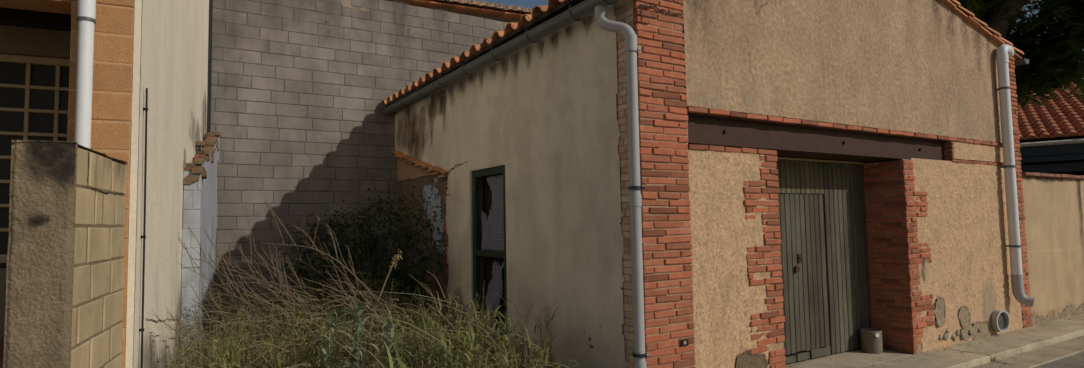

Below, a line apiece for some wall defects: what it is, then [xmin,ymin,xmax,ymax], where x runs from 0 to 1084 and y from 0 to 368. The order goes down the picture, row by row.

spalling [183,131,221,185]
spalling [398,174,449,336]
spalling [933,297,991,341]